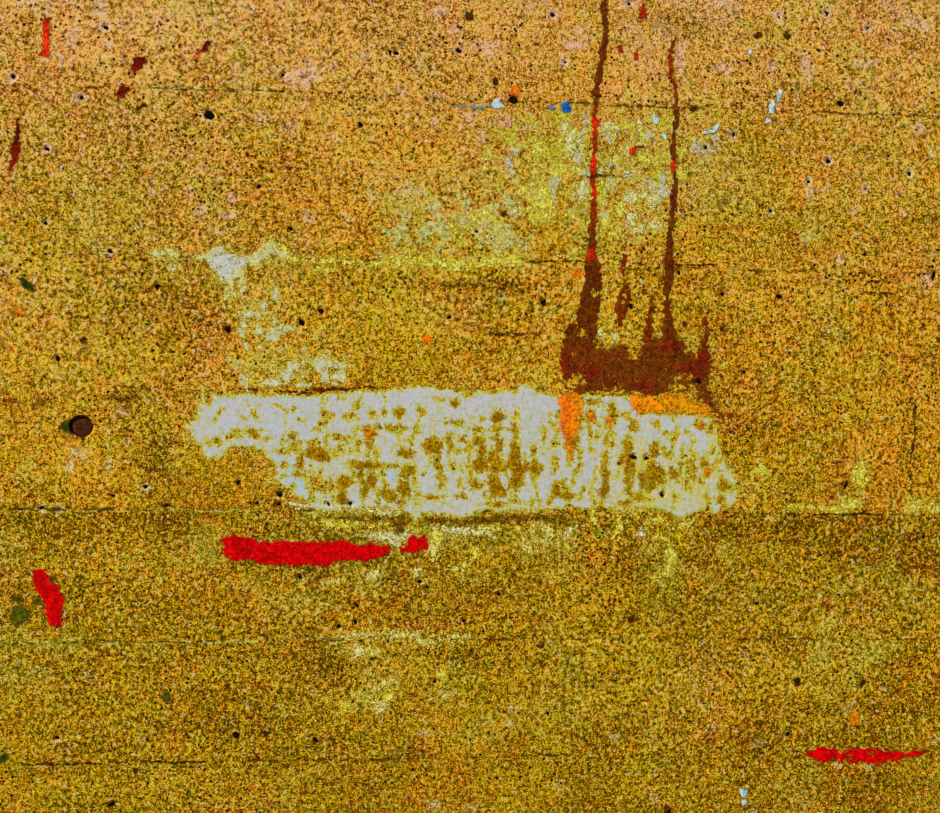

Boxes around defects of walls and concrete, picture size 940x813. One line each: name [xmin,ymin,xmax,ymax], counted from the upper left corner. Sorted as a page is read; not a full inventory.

peeling [181,381,740,530]